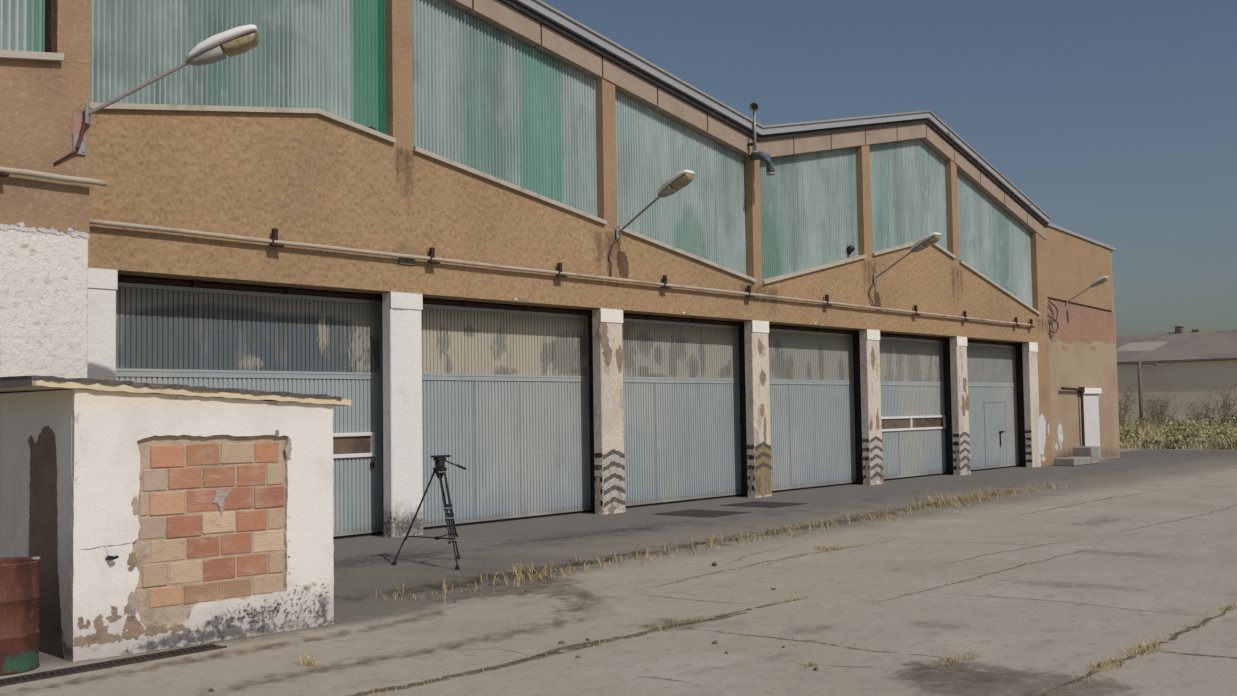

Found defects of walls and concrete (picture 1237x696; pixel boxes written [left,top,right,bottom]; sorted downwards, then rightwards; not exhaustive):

peeling [599,320,624,372]
flaking render [1049,299,1115,351]
peeling [28,426,187,659]